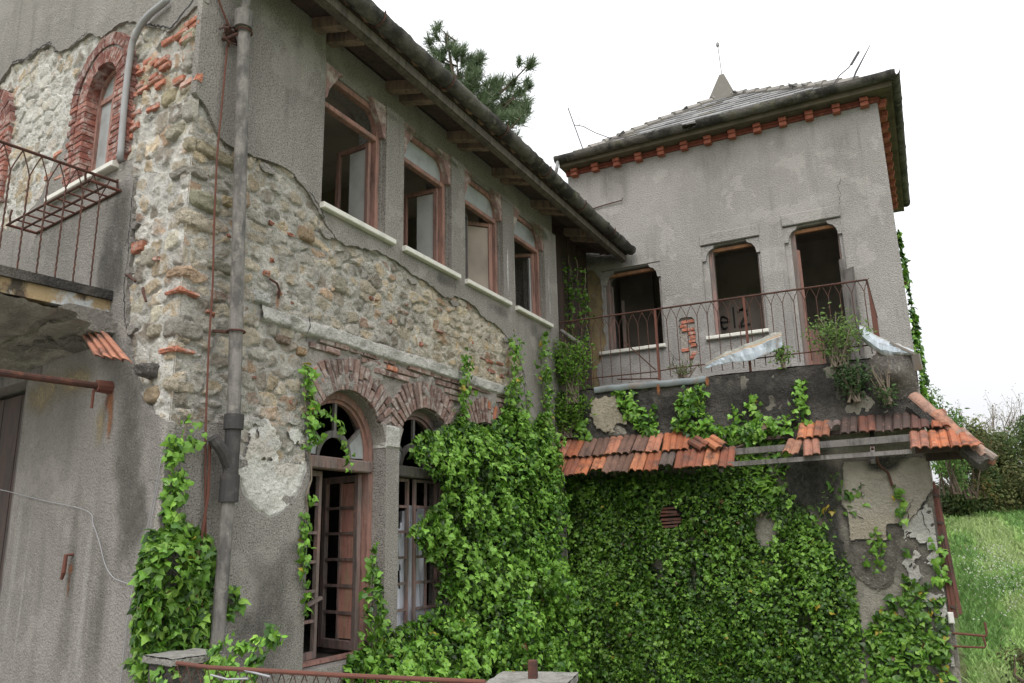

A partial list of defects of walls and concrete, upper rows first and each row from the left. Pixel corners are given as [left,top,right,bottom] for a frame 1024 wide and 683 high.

flaking render [0,8,234,427]
flaking render [239,155,523,518]
flaking render [587,270,627,433]
flaking render [679,318,698,362]
leakage [116,390,144,556]
flaking render [841,456,951,638]